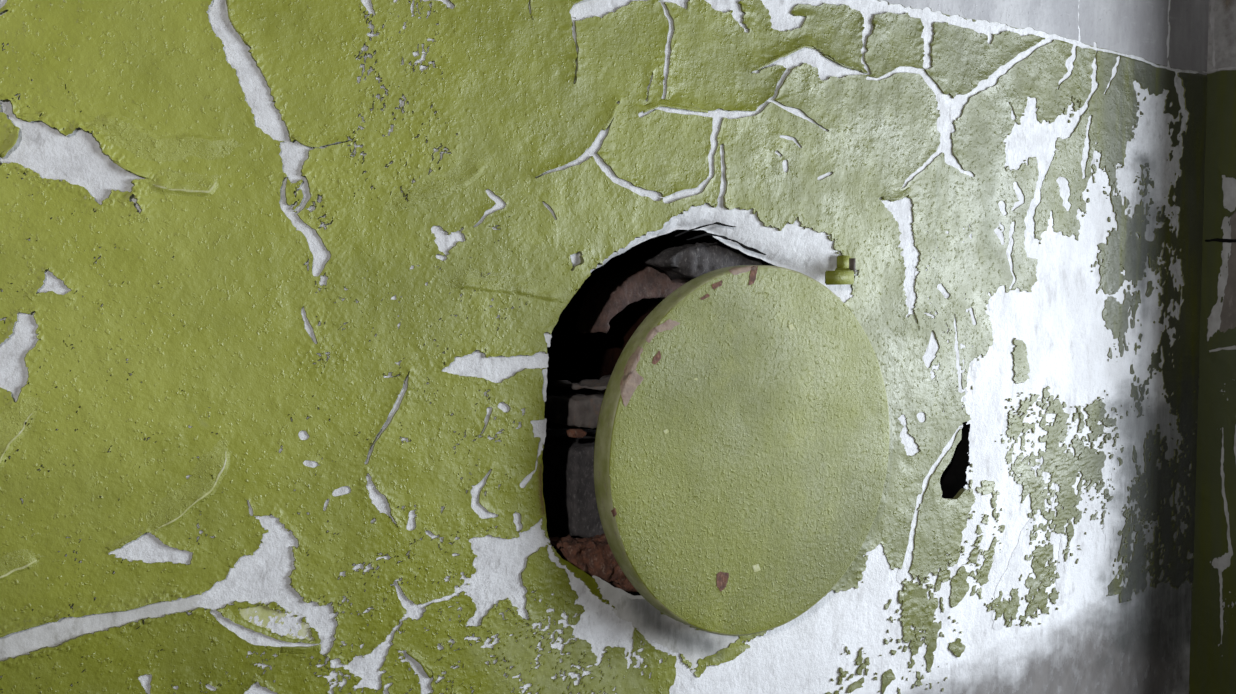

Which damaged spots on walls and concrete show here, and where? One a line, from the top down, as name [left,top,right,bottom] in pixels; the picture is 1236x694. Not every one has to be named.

peeling [0,100,152,211]
crack [535,0,1081,255]
crack [1081,54,1120,179]
crack [1166,0,1189,122]
peeling [36,269,71,295]
peeling [1207,175,1236,352]
peeling [0,311,41,402]
peeling [194,80,1192,694]
peeling [106,526,193,565]
peeling [1210,549,1233,640]